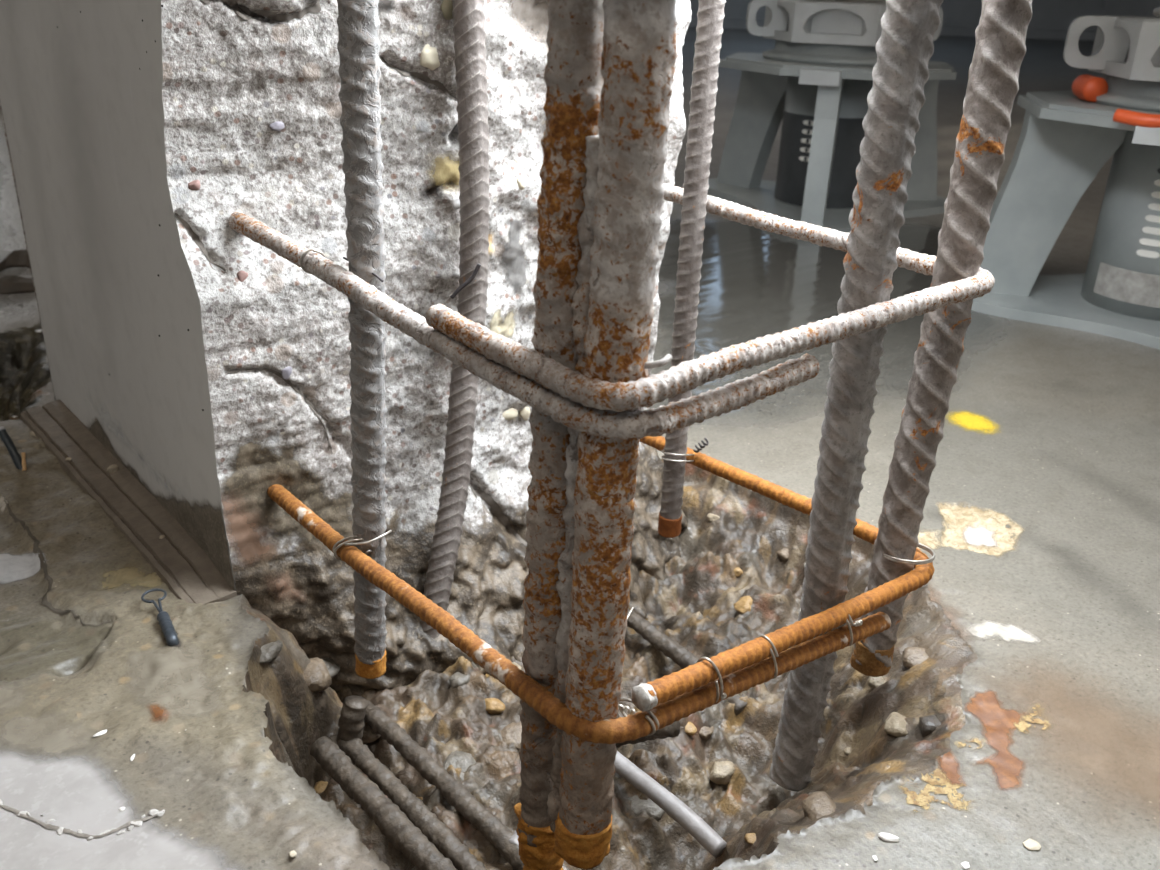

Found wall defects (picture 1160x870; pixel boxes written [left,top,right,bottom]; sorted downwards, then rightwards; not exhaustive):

crack [202,0,321,21]
crack [175,213,226,271]
crack [228,368,333,454]
damp [0,553,45,584]
crack [4,500,111,626]
spalling [628,462,811,661]
spalling [845,535,874,601]
spalling [917,503,1023,557]
spalling [238,594,522,870]
spalling [563,584,978,870]
corrosion [900,690,1051,812]
crack [0,799,165,841]